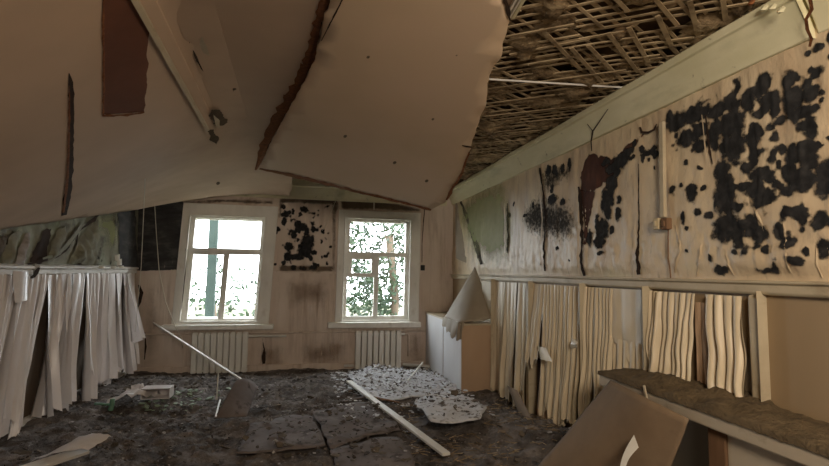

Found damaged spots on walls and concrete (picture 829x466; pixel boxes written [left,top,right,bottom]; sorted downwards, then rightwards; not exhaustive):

spalling [747,0,786,14]
peeling [102,0,149,117]
flaking render [0,226,67,264]
crack [27,73,99,265]
flaking render [67,220,124,269]
damp [98,202,183,271]
damp [197,199,419,271]
damp [523,158,573,250]
damp [580,33,829,276]